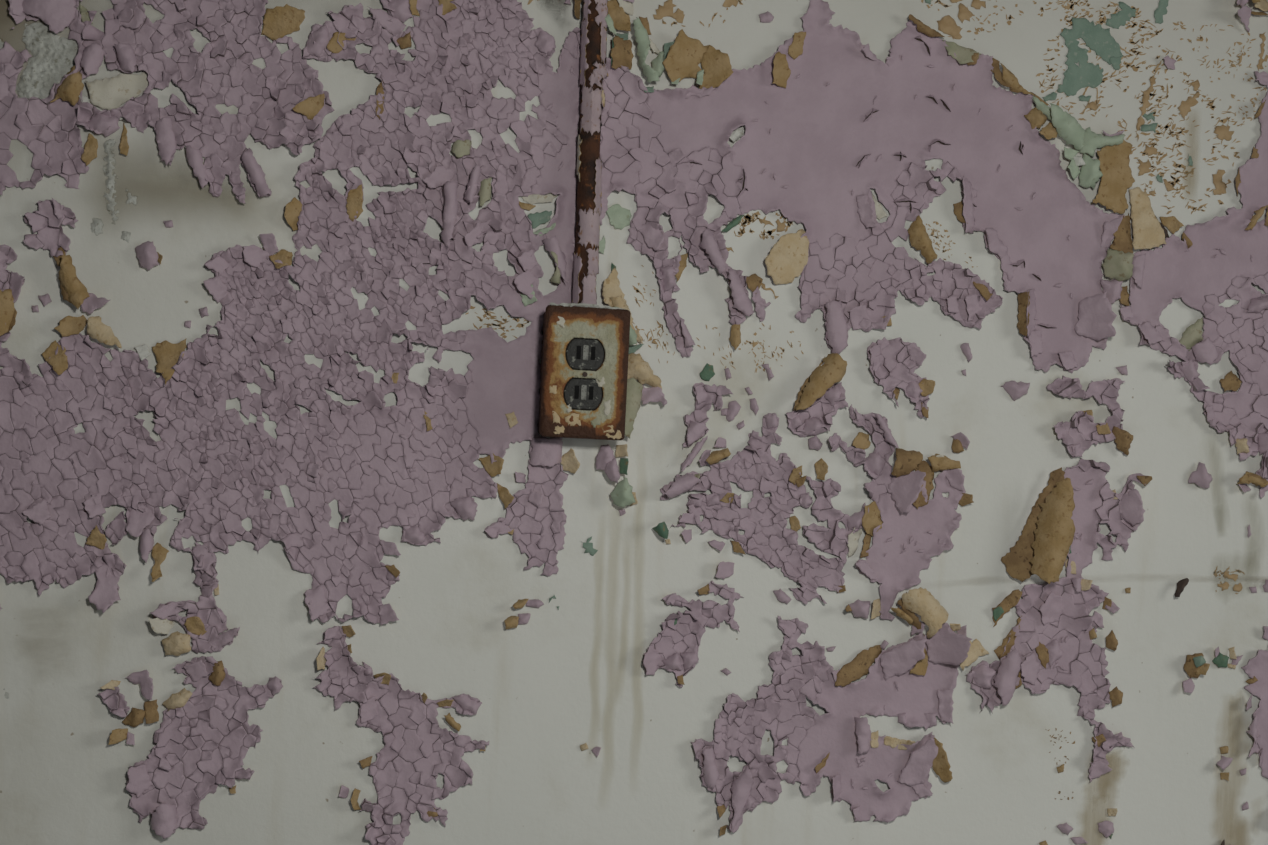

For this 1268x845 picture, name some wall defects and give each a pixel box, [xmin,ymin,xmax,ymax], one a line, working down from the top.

peeling [98,656,283,839]
peeling [0,0,591,656]
peeling [313,625,489,845]
peeling [578,0,1268,839]